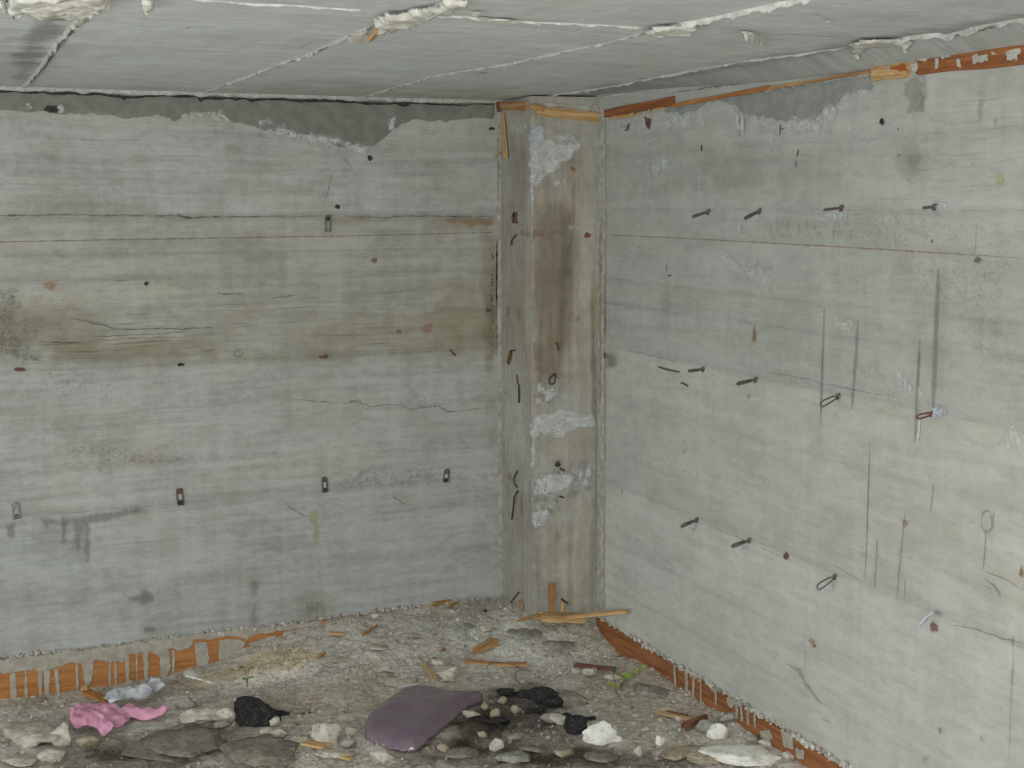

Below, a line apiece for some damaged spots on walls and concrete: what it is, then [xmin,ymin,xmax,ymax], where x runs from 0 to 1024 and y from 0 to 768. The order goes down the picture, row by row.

spalling [0,0,111,21]
spalling [373,0,522,36]
spalling [26,103,64,113]
peeling [258,117,373,161]
spalling [532,457,593,530]